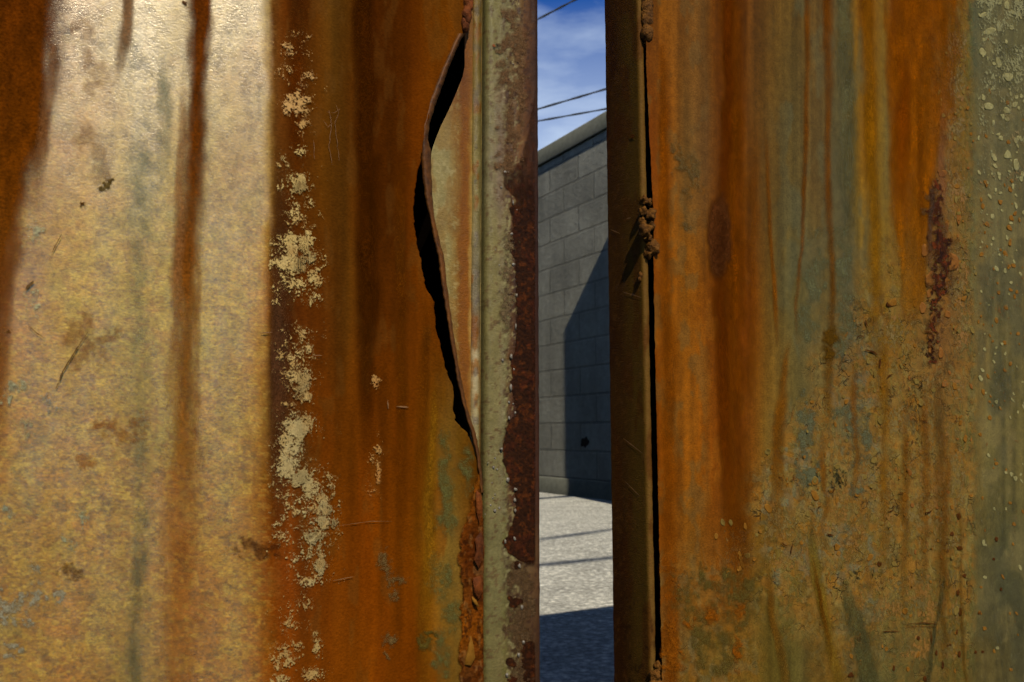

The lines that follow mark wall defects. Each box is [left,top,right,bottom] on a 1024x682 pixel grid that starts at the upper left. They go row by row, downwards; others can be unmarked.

corrosion [0,0,58,333]
corrosion [119,0,133,55]
corrosion [174,0,211,469]
peeling [267,30,327,307]
corrosion [493,1,529,173]
corrosion [708,197,732,276]
corrosion [862,0,956,305]
peeling [974,0,1024,441]
peeling [265,322,345,682]
corrosion [457,475,484,682]
corrosion [810,544,842,682]
peeling [978,433,1024,571]